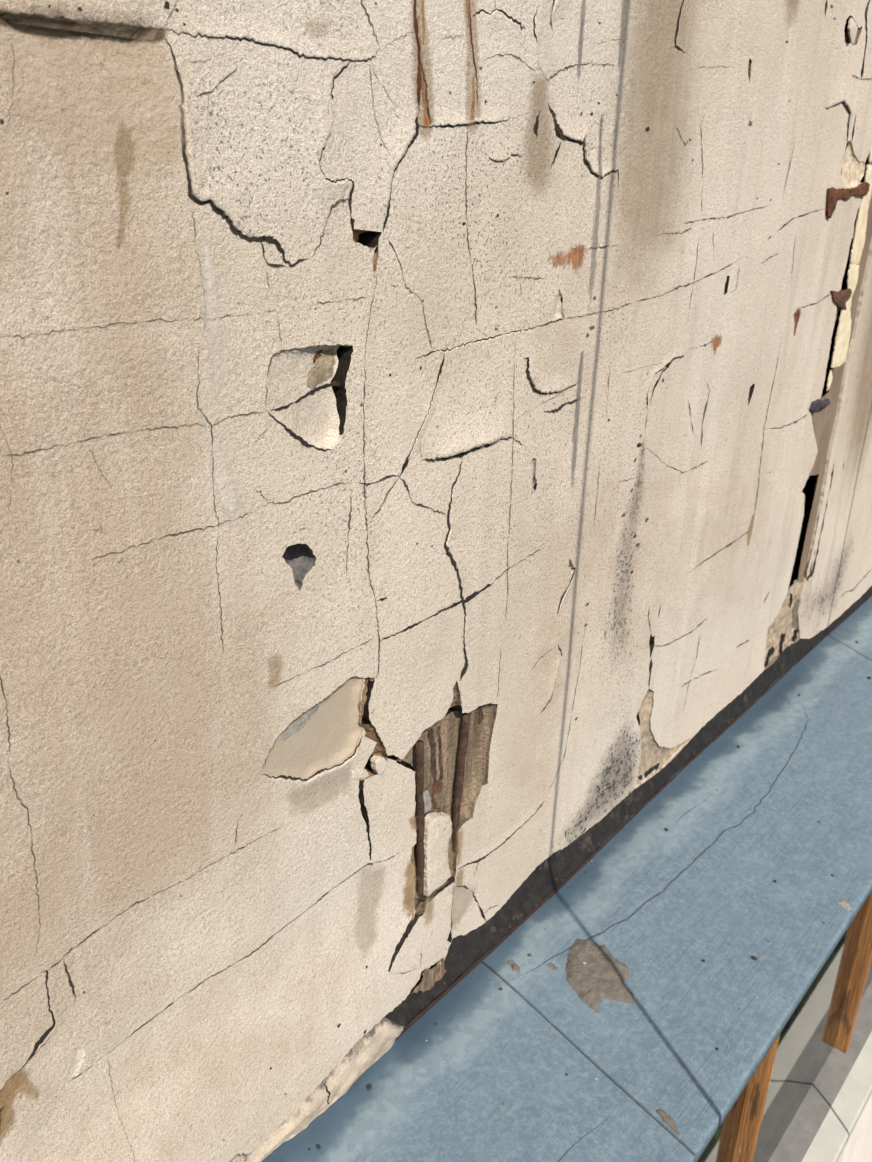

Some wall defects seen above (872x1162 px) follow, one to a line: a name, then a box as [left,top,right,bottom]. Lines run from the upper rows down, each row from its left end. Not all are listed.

rust [421,80,432,126]
crack [825,0,872,141]
spalling [841,141,865,188]
spalling [265,344,363,452]
crack [690,339,806,572]
hole [282,543,317,591]
spalling [764,580,805,667]
crack [806,464,844,580]
spalling [261,676,365,779]
spalling [396,681,498,916]
crack [0,677,284,1074]
crack [107,1002,173,1162]